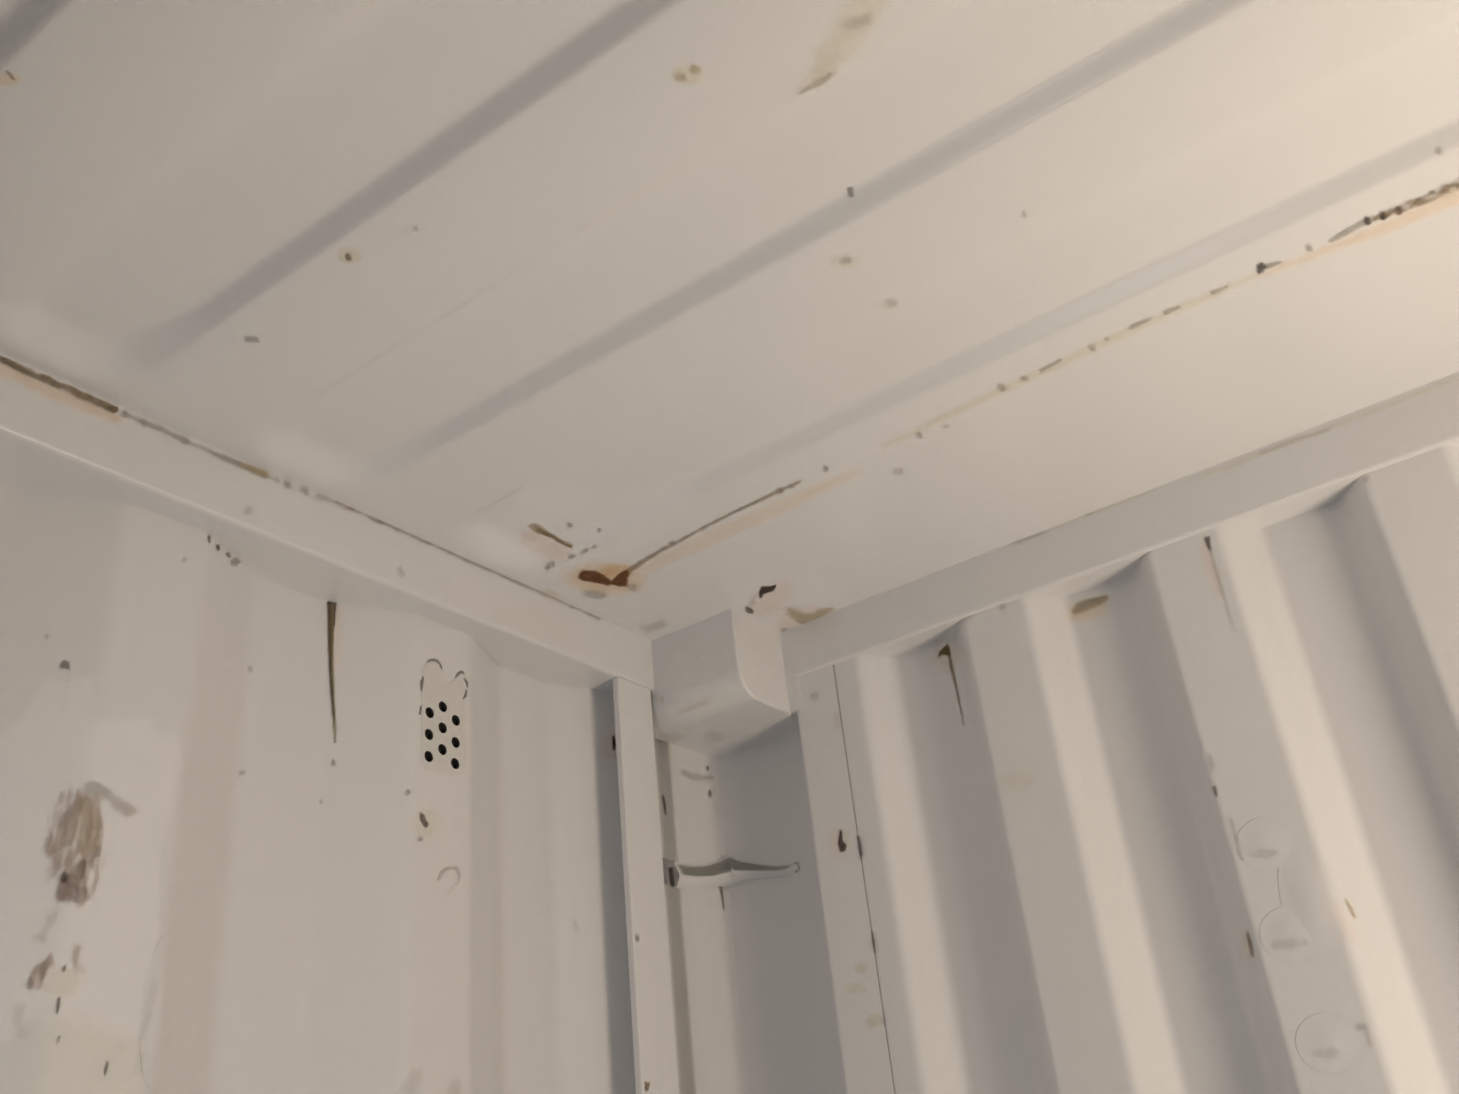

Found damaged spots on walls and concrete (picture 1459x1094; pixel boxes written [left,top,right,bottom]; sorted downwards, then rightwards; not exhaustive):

corrosion [529,483,798,587]
corrosion [789,609,831,623]
corrosion [1072,595,1107,614]
corrosion [938,645,963,720]